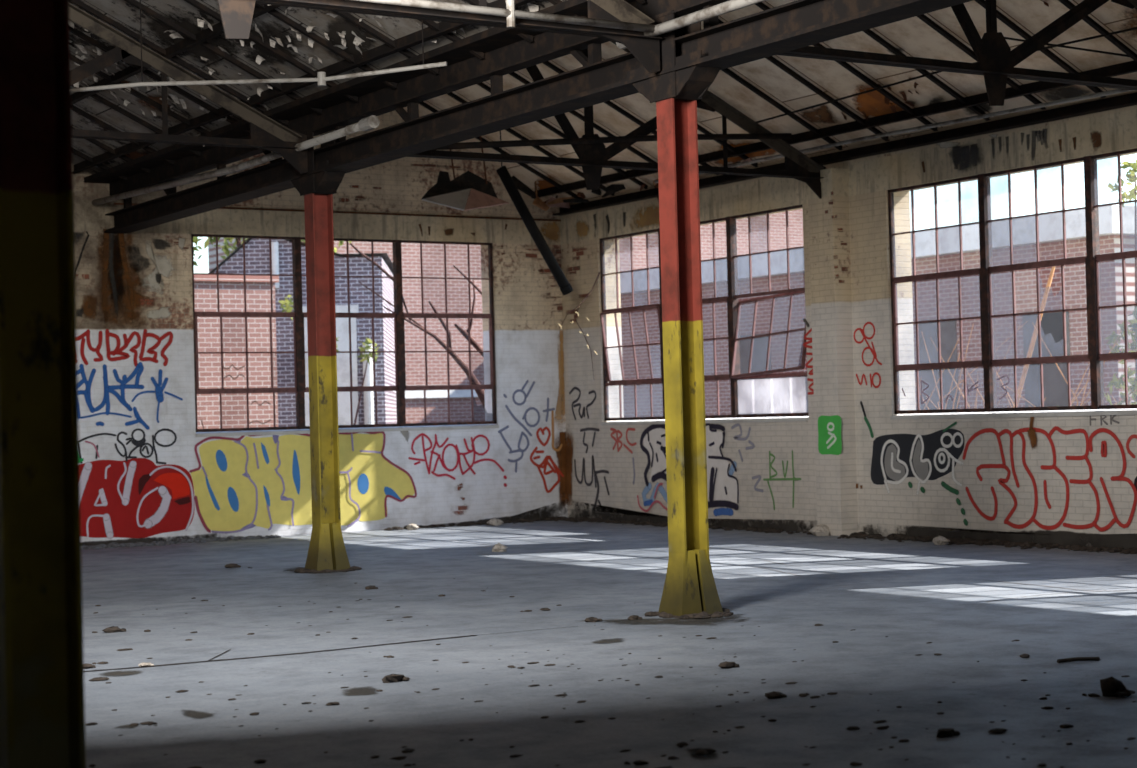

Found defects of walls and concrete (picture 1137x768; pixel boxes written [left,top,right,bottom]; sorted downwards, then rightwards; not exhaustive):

peeling [69,21,125,88]
peeling [110,71,233,127]
rust [854,85,904,118]
rust [82,229,150,327]
peeling [139,245,173,319]